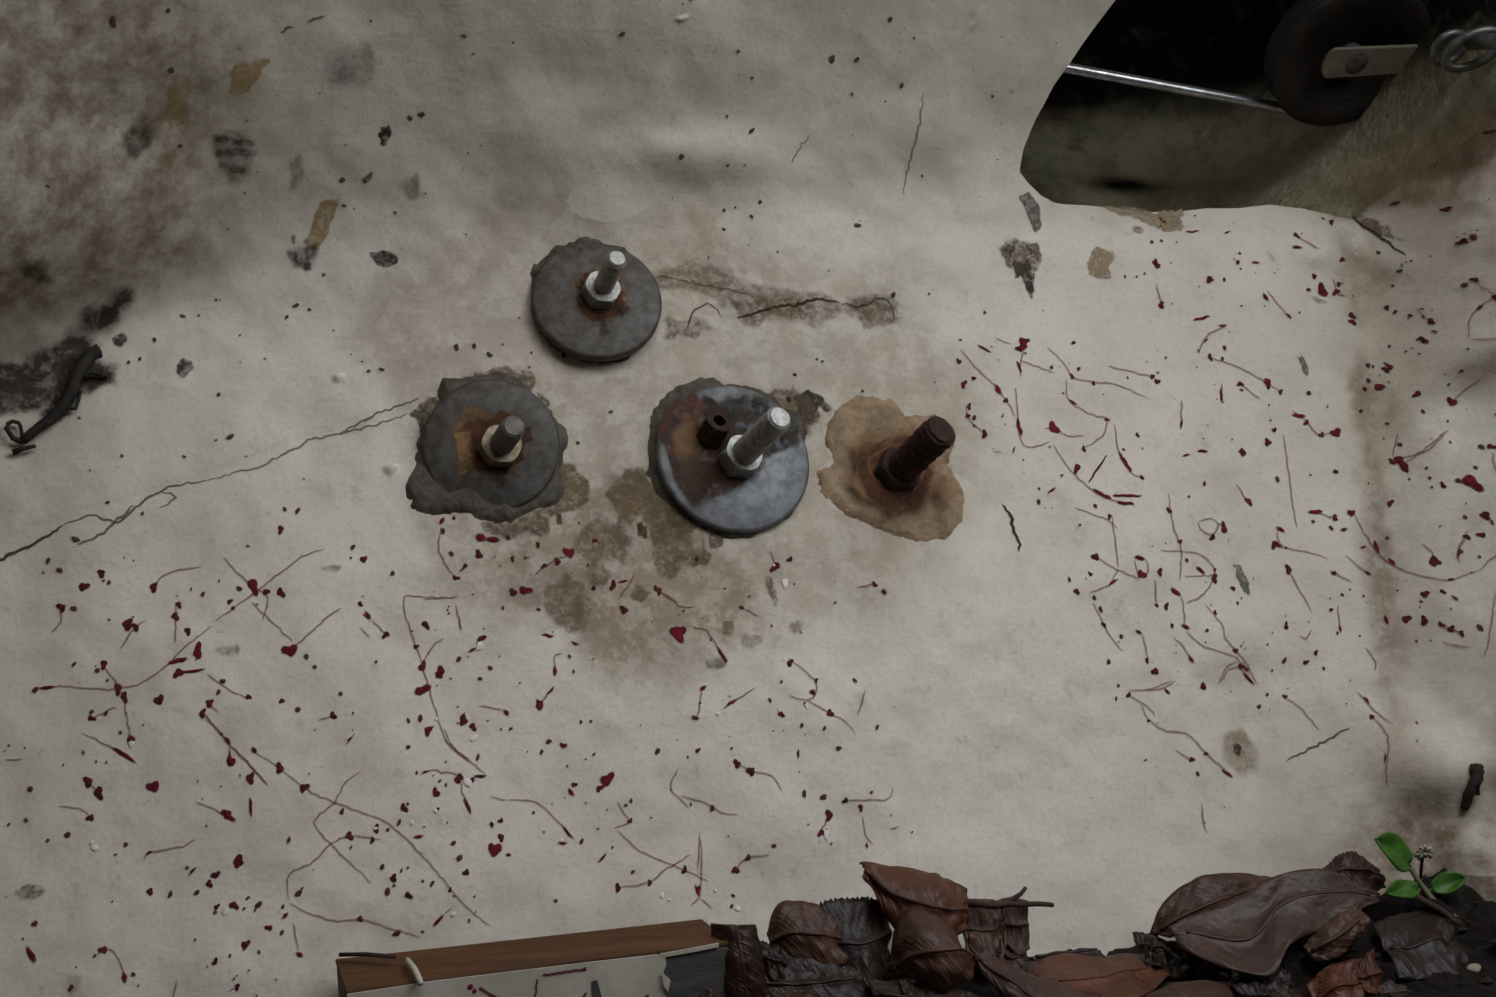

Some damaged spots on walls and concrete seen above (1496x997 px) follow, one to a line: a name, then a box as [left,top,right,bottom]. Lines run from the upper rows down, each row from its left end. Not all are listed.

peeling [1105,206,1183,233]
crack [0,398,419,561]
rust [453,407,532,487]
rust [659,392,800,503]
rust [851,428,957,512]
water stain [403,463,724,813]
water stain [670,606,758,661]
water stain [40,549,488,957]
water stain [733,759,781,788]
water stain [488,818,511,857]
water stain [616,803,711,907]
water stain [732,854,767,873]